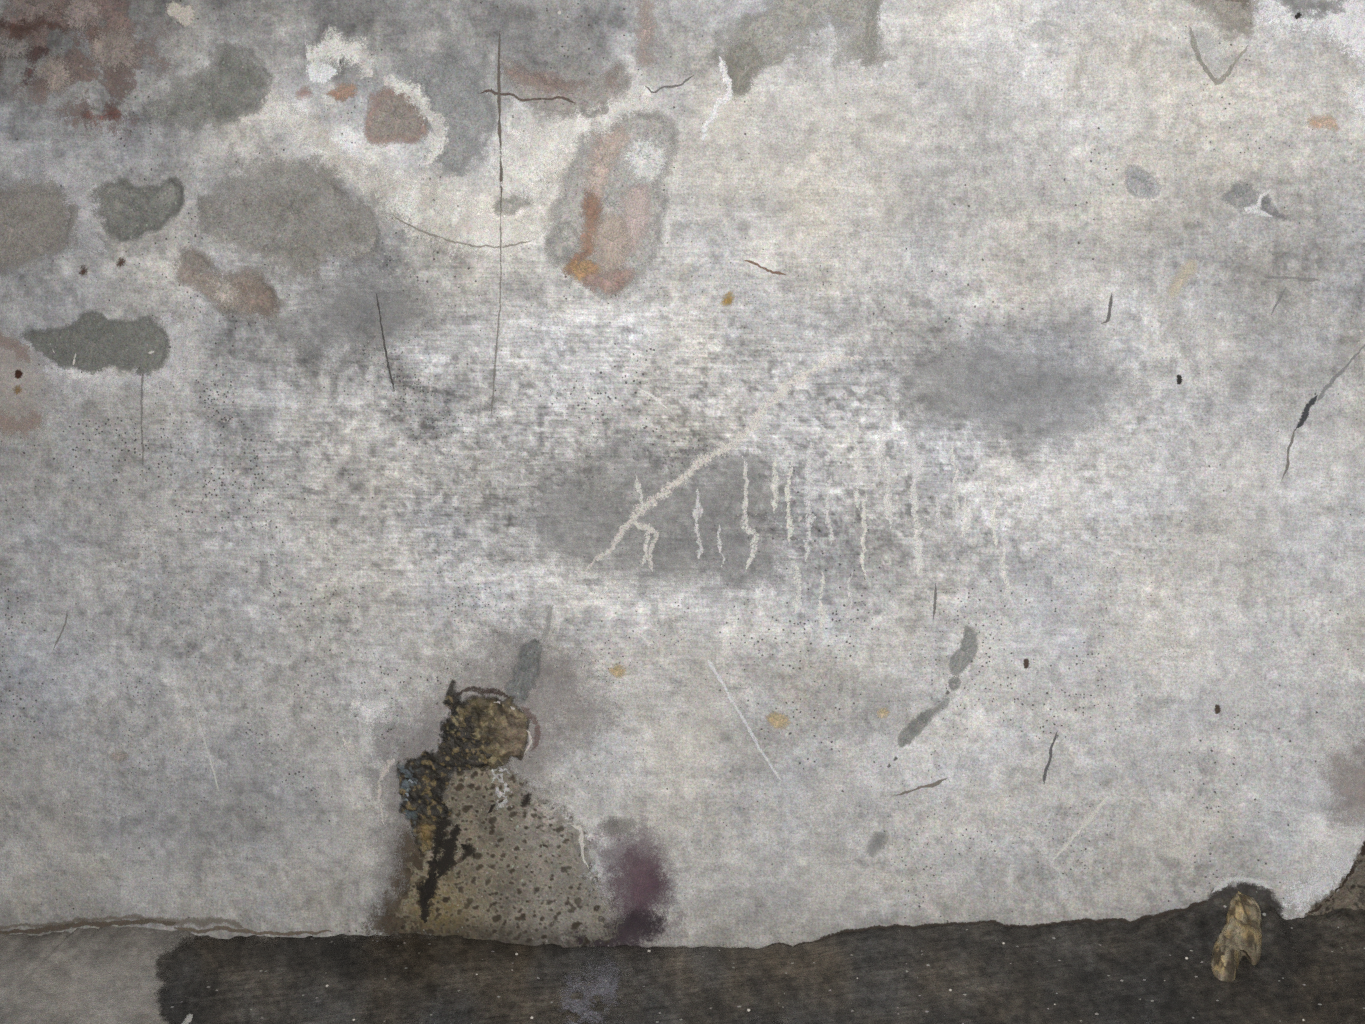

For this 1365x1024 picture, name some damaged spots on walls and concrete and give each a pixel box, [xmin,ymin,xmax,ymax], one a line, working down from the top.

leakage [692,489,725,567]
leakage [741,456,759,569]
leakage [770,439,834,613]
leakage [818,572,828,631]
leakage [847,410,894,611]
leakage [909,441,972,574]
leakage [990,473,1011,601]
leakage [156,680,1365,1024]